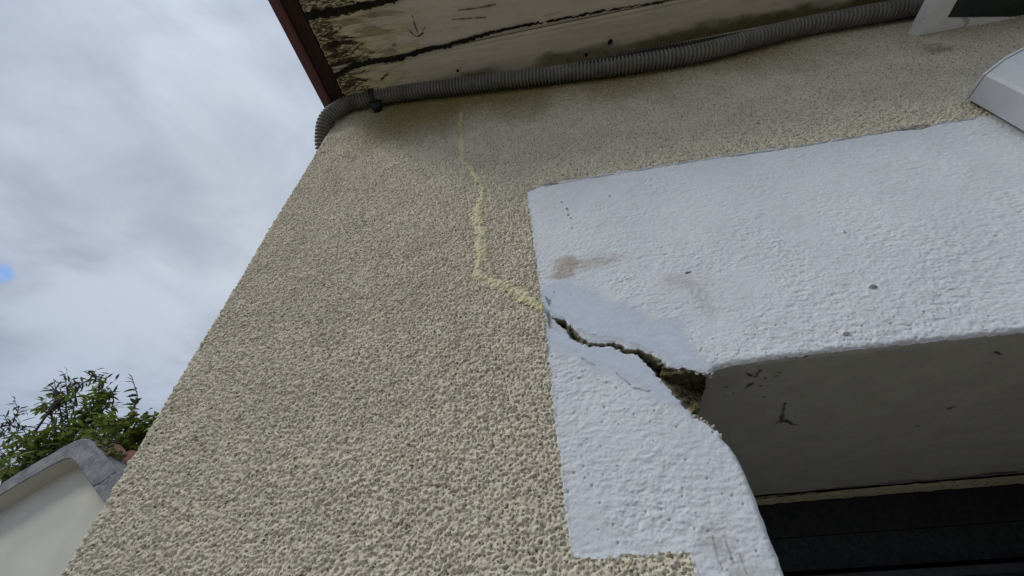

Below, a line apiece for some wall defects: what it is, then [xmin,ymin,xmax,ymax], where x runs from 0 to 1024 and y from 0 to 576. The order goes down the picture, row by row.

water stain [309,11,381,67]
water stain [540,0,889,69]
crack [457,111,663,377]